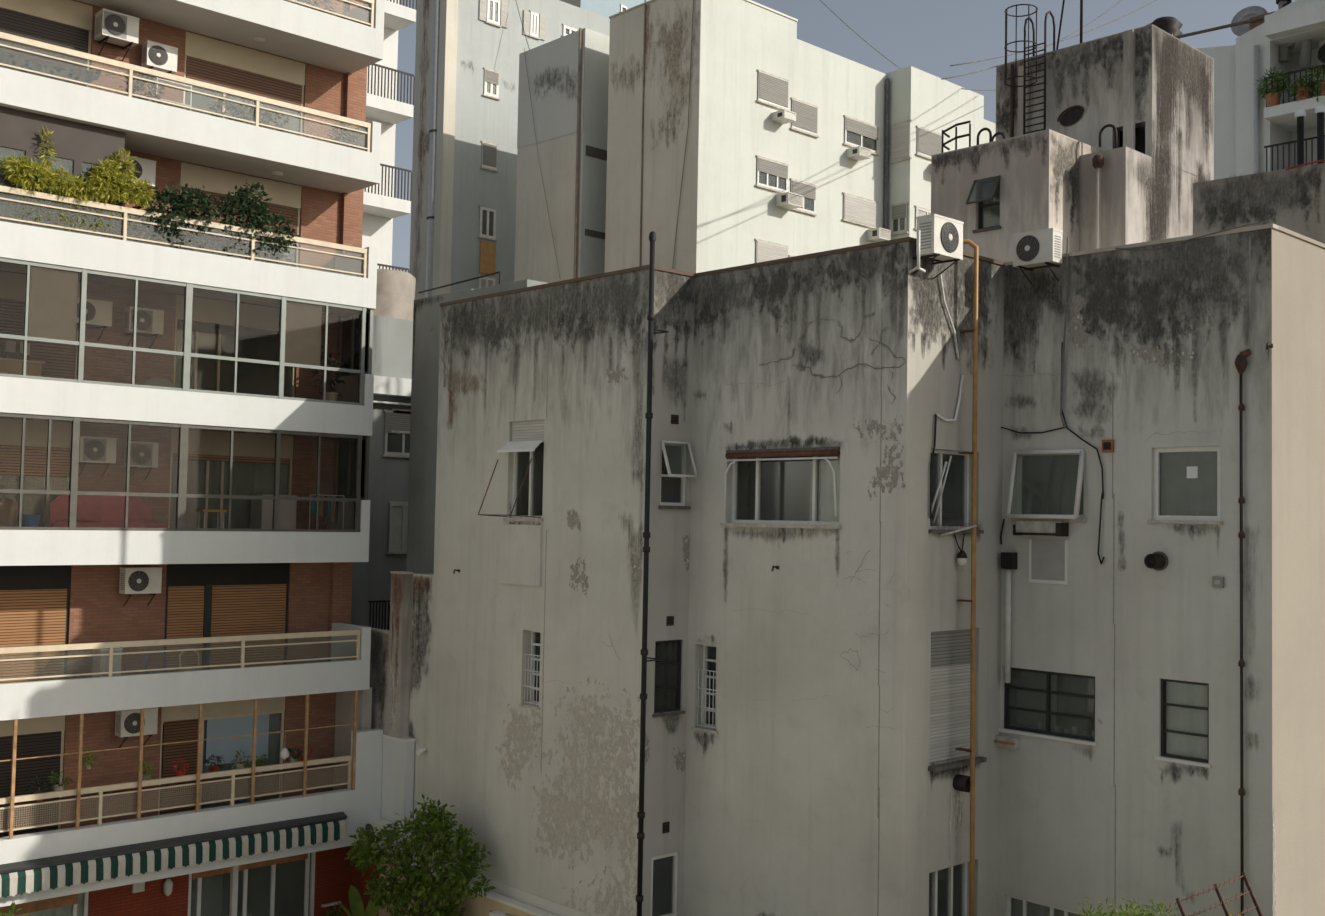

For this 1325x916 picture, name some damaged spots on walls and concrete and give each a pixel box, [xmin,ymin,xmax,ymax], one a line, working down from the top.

water stain [932,146,988,167]
water stain [997,60,1080,227]
water stain [1057,32,1320,387]
water stain [445,243,1062,462]
crack [727,314,905,403]
peeling [853,417,906,498]
peeling [496,679,650,916]